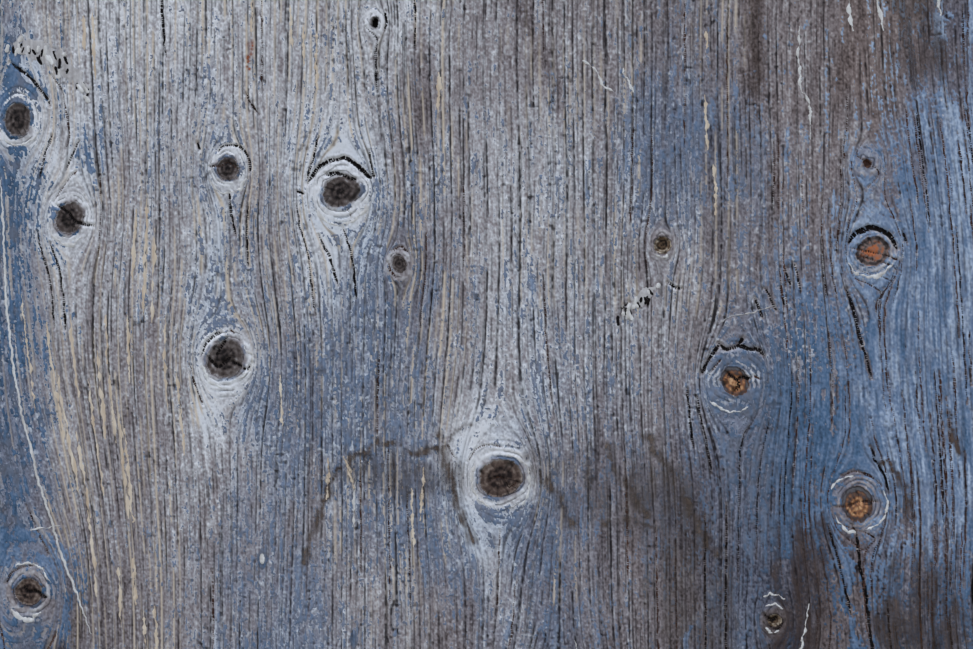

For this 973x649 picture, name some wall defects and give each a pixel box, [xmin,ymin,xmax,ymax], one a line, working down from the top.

peeling [463,55,515,193]
peeling [816,48,838,153]
peeling [0,0,148,649]